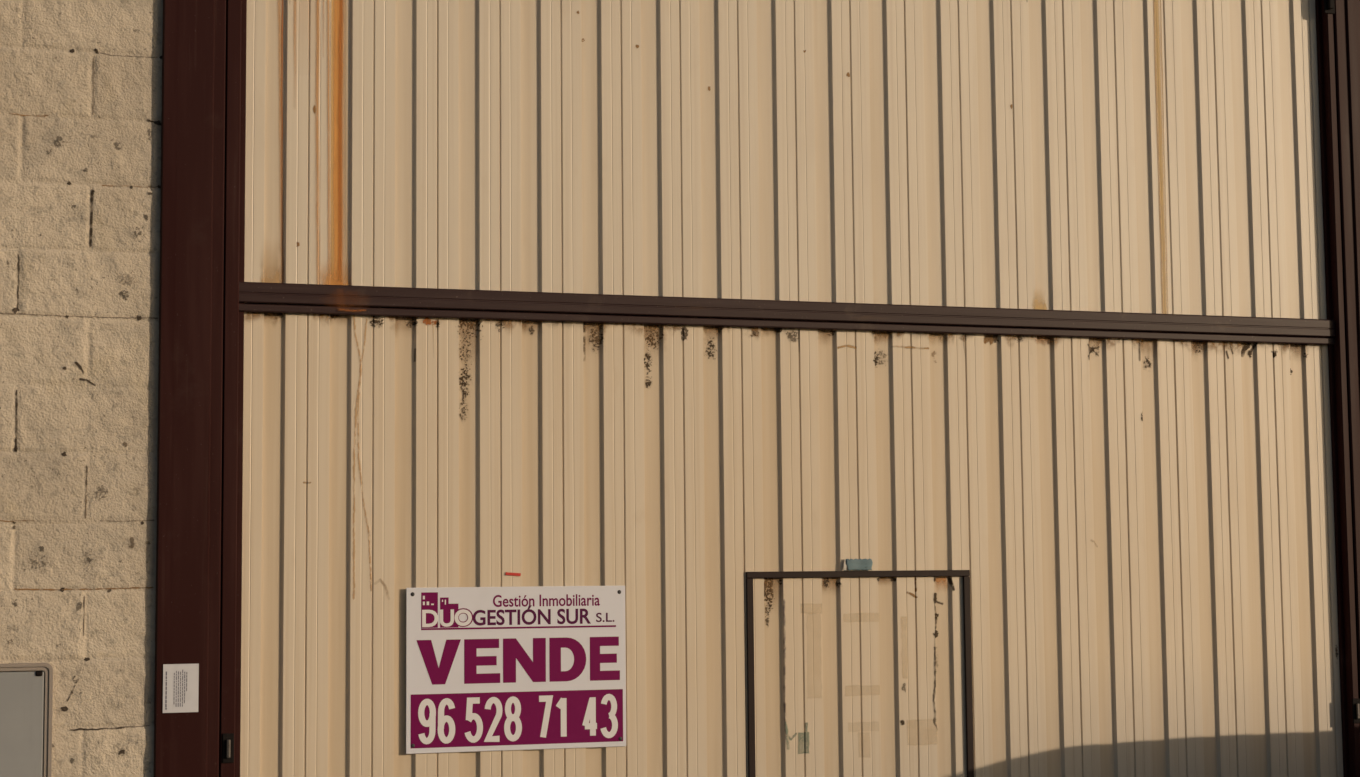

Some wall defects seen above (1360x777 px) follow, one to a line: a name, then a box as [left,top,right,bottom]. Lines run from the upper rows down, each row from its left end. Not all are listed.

rust [316,0,349,285]
damp [459,318,542,420]
damp [583,322,688,388]
damp [704,326,727,359]
damp [750,327,798,342]
damp [984,334,1058,345]
damp [1088,338,1158,368]
damp [1176,340,1316,359]